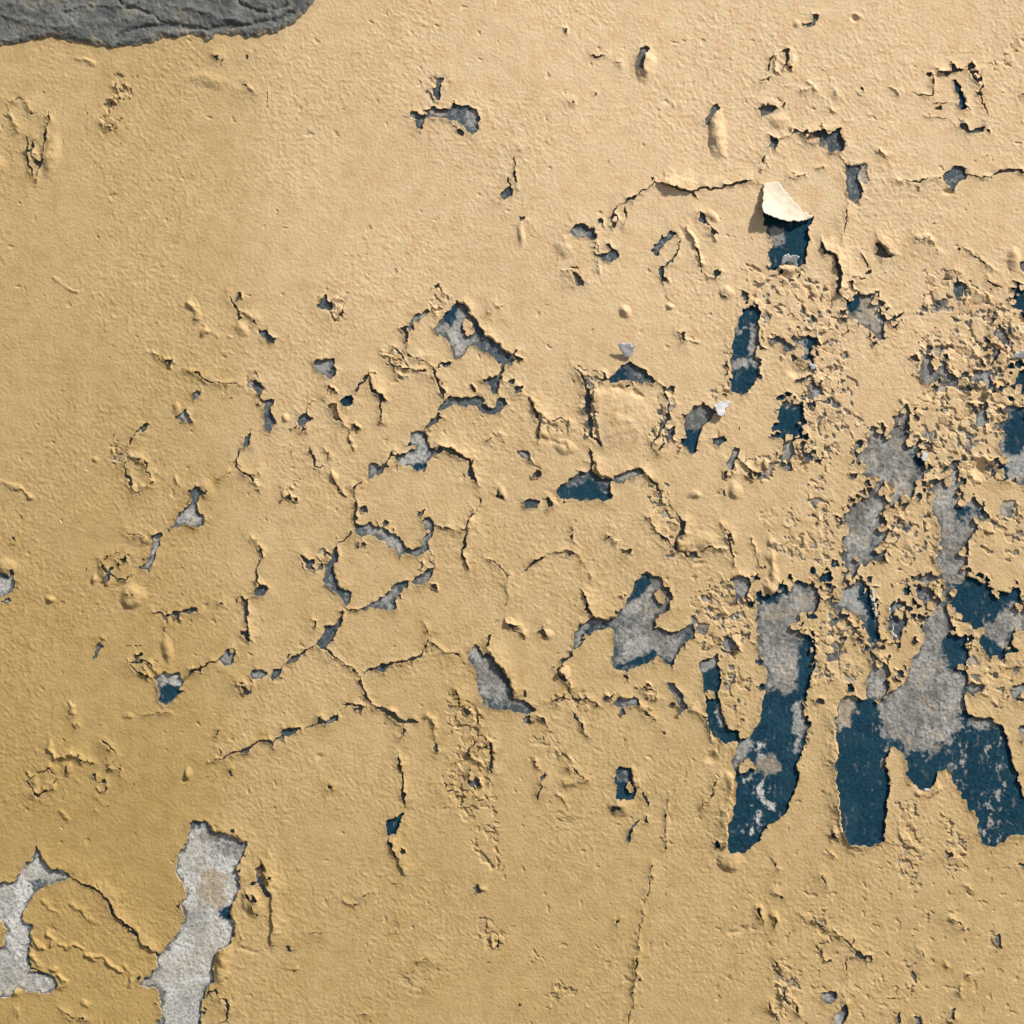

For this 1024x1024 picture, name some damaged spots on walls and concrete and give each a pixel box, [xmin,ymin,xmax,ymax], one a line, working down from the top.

peeling [409,73,481,136]
crack [601,177,760,232]
crack [152,351,277,492]
crack [229,292,276,344]
crack [346,451,396,526]
peeling [291,283,524,472]
crack [405,346,590,629]
crack [569,362,608,447]
crack [649,386,677,457]
peeling [423,102,1024,894]
crack [153,536,463,908]
peeling [0,820,273,1024]